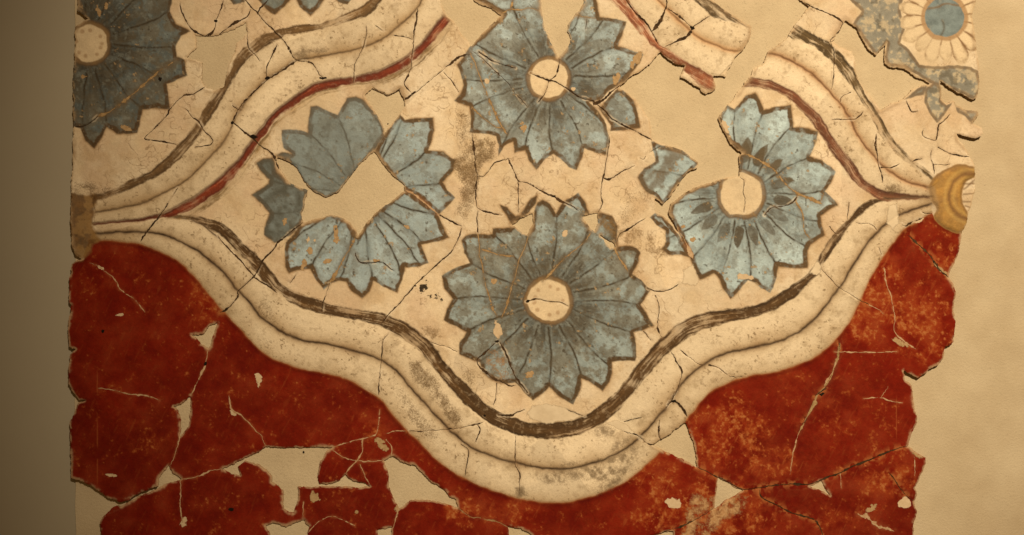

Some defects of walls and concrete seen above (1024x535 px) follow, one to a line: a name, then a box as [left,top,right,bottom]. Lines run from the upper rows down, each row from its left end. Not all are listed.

crack [626,0,709,46]
crack [180,0,321,169]
flaking render [612,0,808,242]
crack [874,103,969,183]
crack [334,9,660,491]
flaking render [193,323,217,348]
crack [624,284,742,445]
crack [698,153,915,535]
flaking render [174,397,191,436]
flaking render [223,446,369,535]
flaking render [374,437,458,512]
peeling [665,497,681,508]